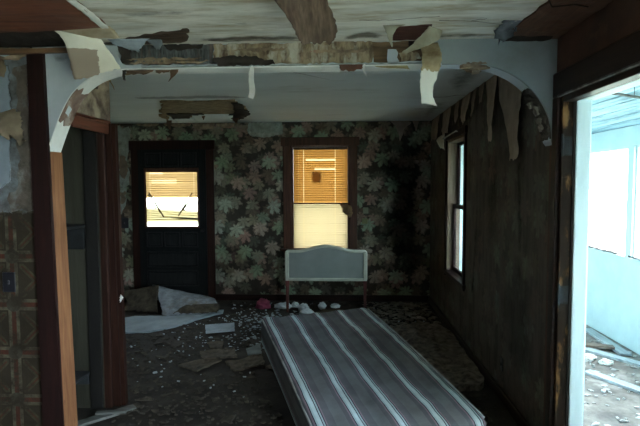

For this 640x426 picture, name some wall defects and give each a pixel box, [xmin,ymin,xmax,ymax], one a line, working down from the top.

flaking render [117,40,422,99]
flaking render [0,0,115,212]
flaking render [159,99,283,137]
flaking render [522,88,551,141]